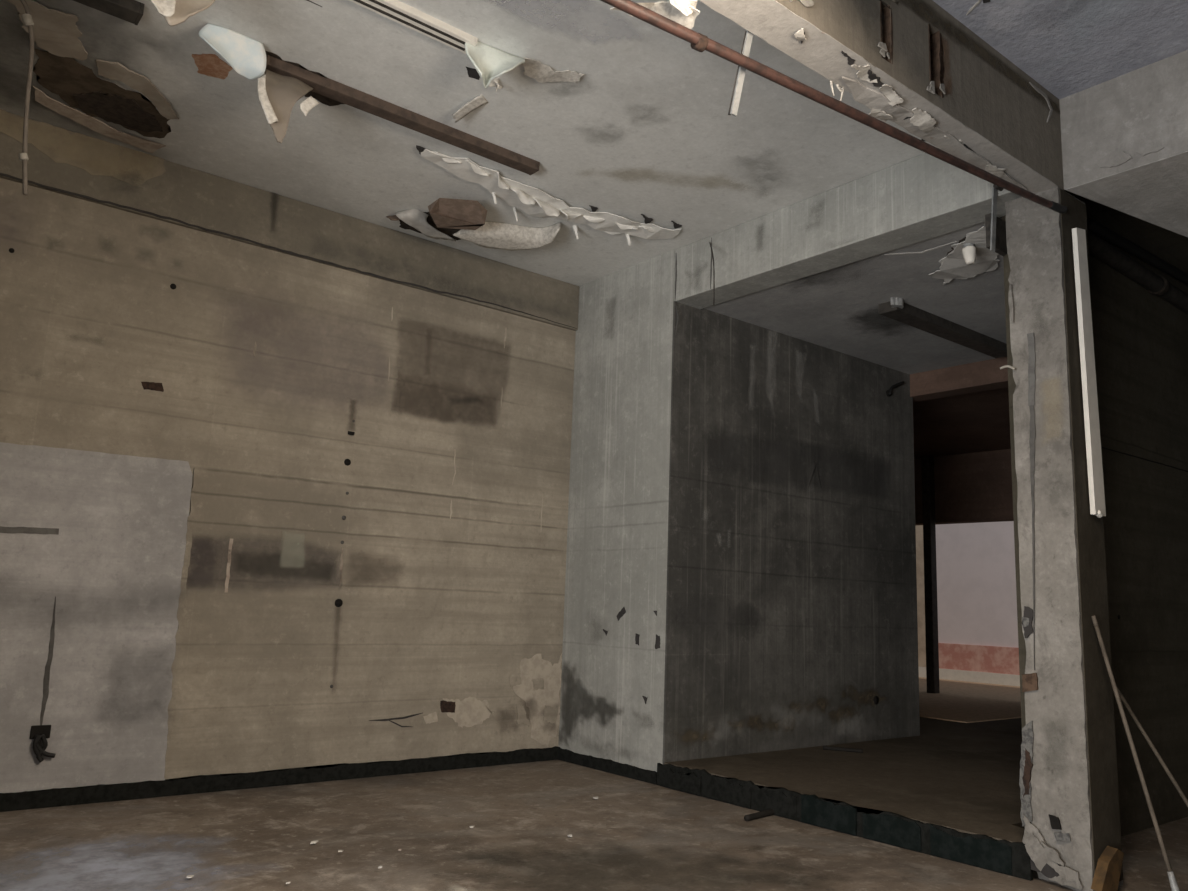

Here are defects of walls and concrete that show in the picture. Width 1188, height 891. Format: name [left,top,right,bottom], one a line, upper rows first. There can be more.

spalling [0,0,179,186]
peeling [151,0,344,143]
peeling [794,28,806,44]
peeling [830,50,1028,191]
peeling [386,145,682,251]
water stain [560,667,616,740]
spalling [1019,721,1083,889]